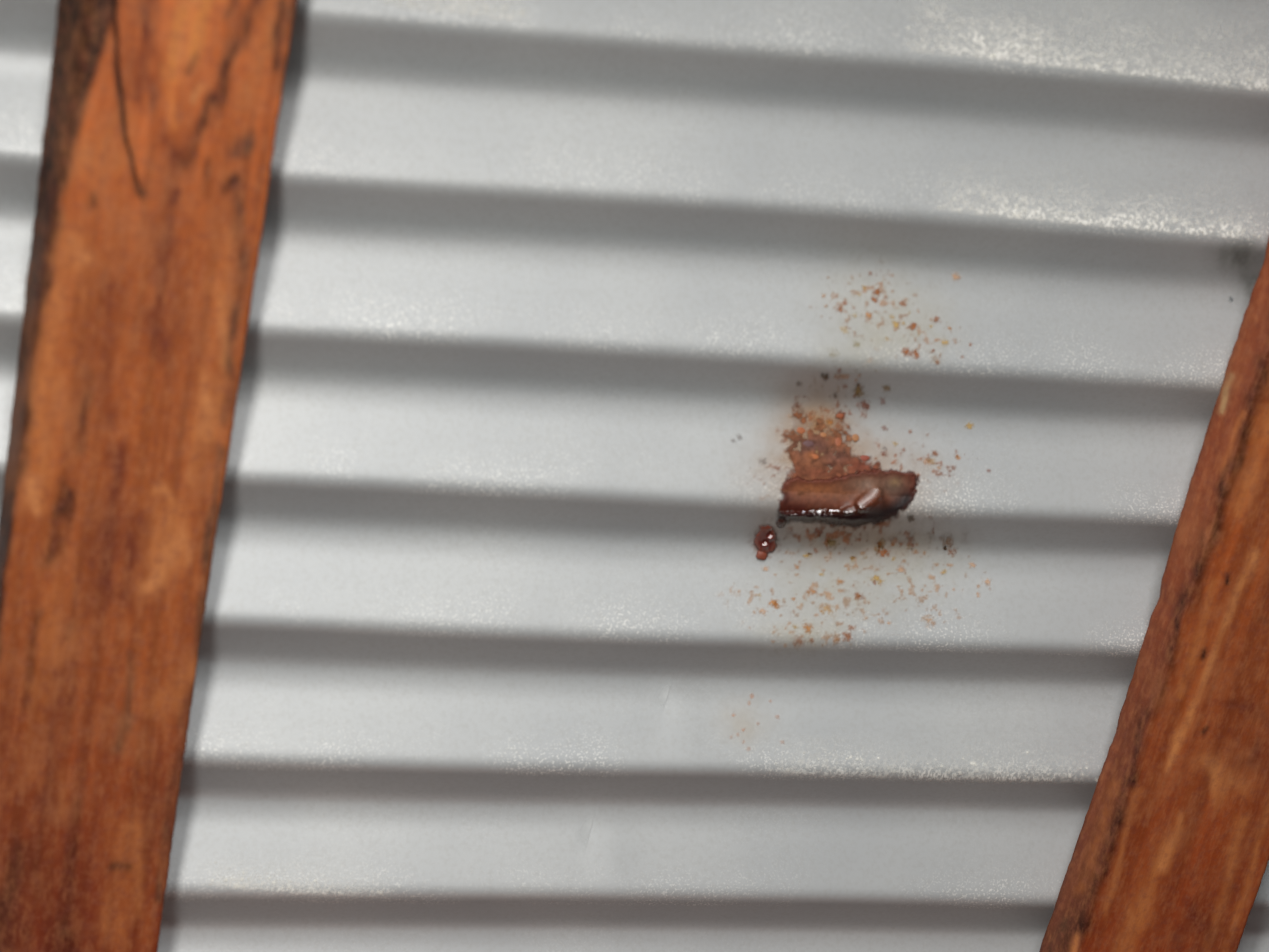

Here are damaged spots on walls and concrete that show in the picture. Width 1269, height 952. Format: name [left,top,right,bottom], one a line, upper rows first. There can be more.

corrosion [754,406,919,560]